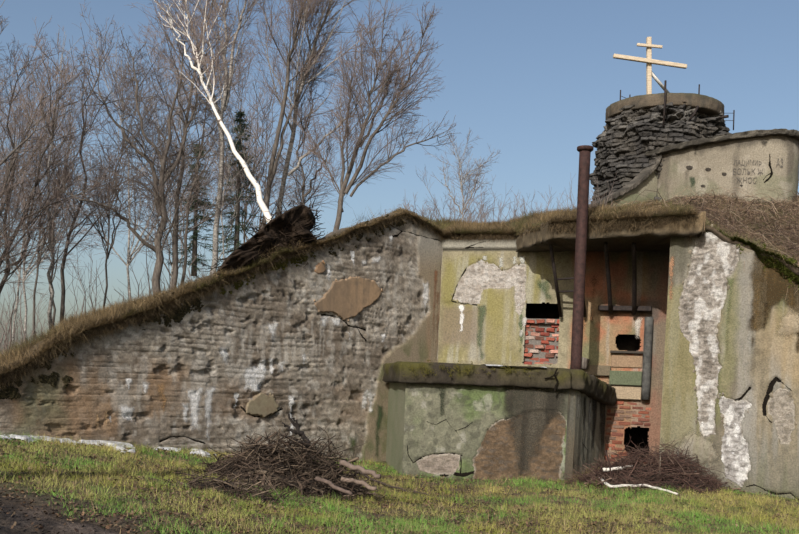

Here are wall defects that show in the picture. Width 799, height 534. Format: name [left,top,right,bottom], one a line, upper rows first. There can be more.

crack [763,154,773,183]
flaking render [314,276,383,322]
spalling [451,258,527,315]
water stain [750,250,799,342]
crack [321,314,367,342]
spalling [678,224,752,487]
water stain [183,388,214,436]
spalling [416,453,460,478]
crack [407,410,475,477]
spalling [473,412,566,481]
crack [746,484,799,500]
spalling [767,388,797,445]